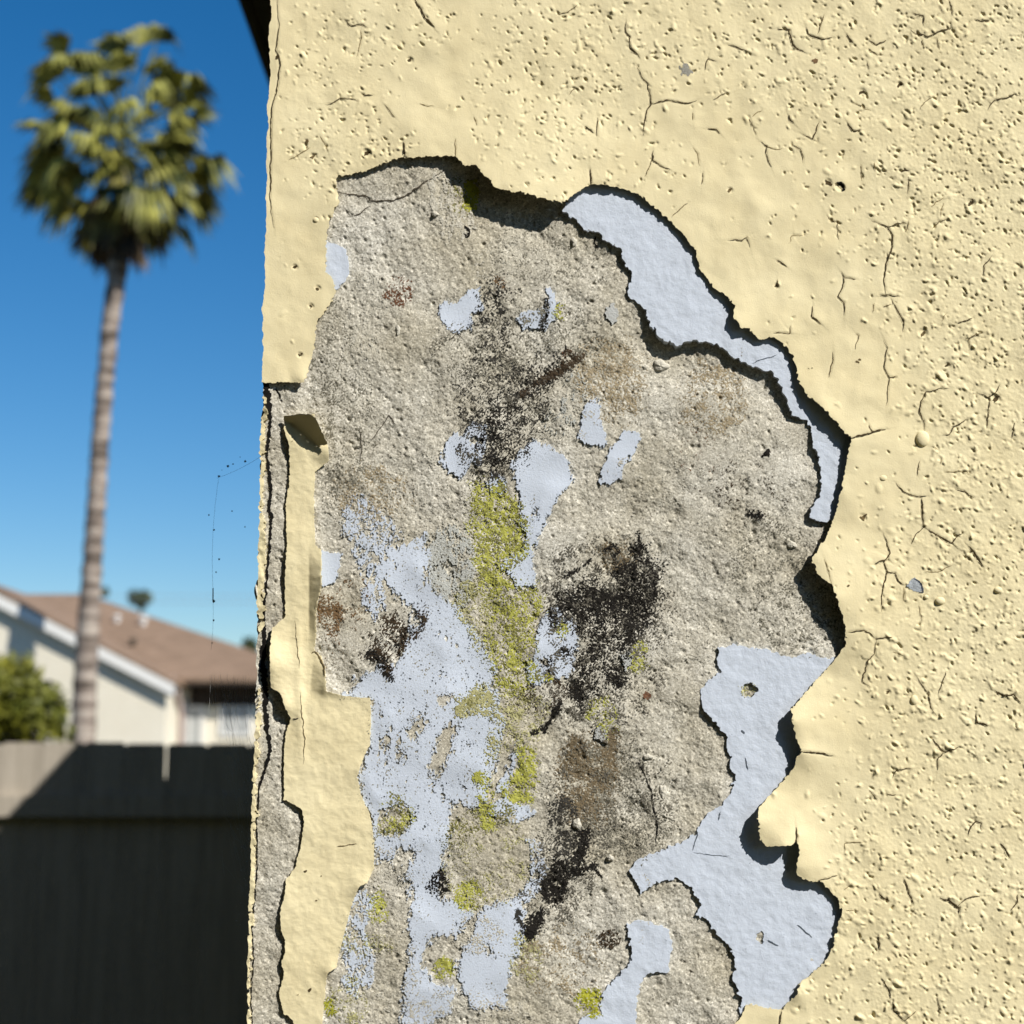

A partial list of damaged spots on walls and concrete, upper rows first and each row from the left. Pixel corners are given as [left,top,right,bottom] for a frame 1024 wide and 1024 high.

crack [609,25,726,176]
crack [778,16,886,68]
crack [250,383,283,1024]
leakage [302,220,652,549]
spalling [247,156,847,1024]
leakage [355,355,843,1024]
crack [853,426,885,438]
crack [829,198,947,404]
crack [875,387,999,618]
crack [917,674,958,768]
crack [882,979,940,1021]
crack [941,896,980,914]